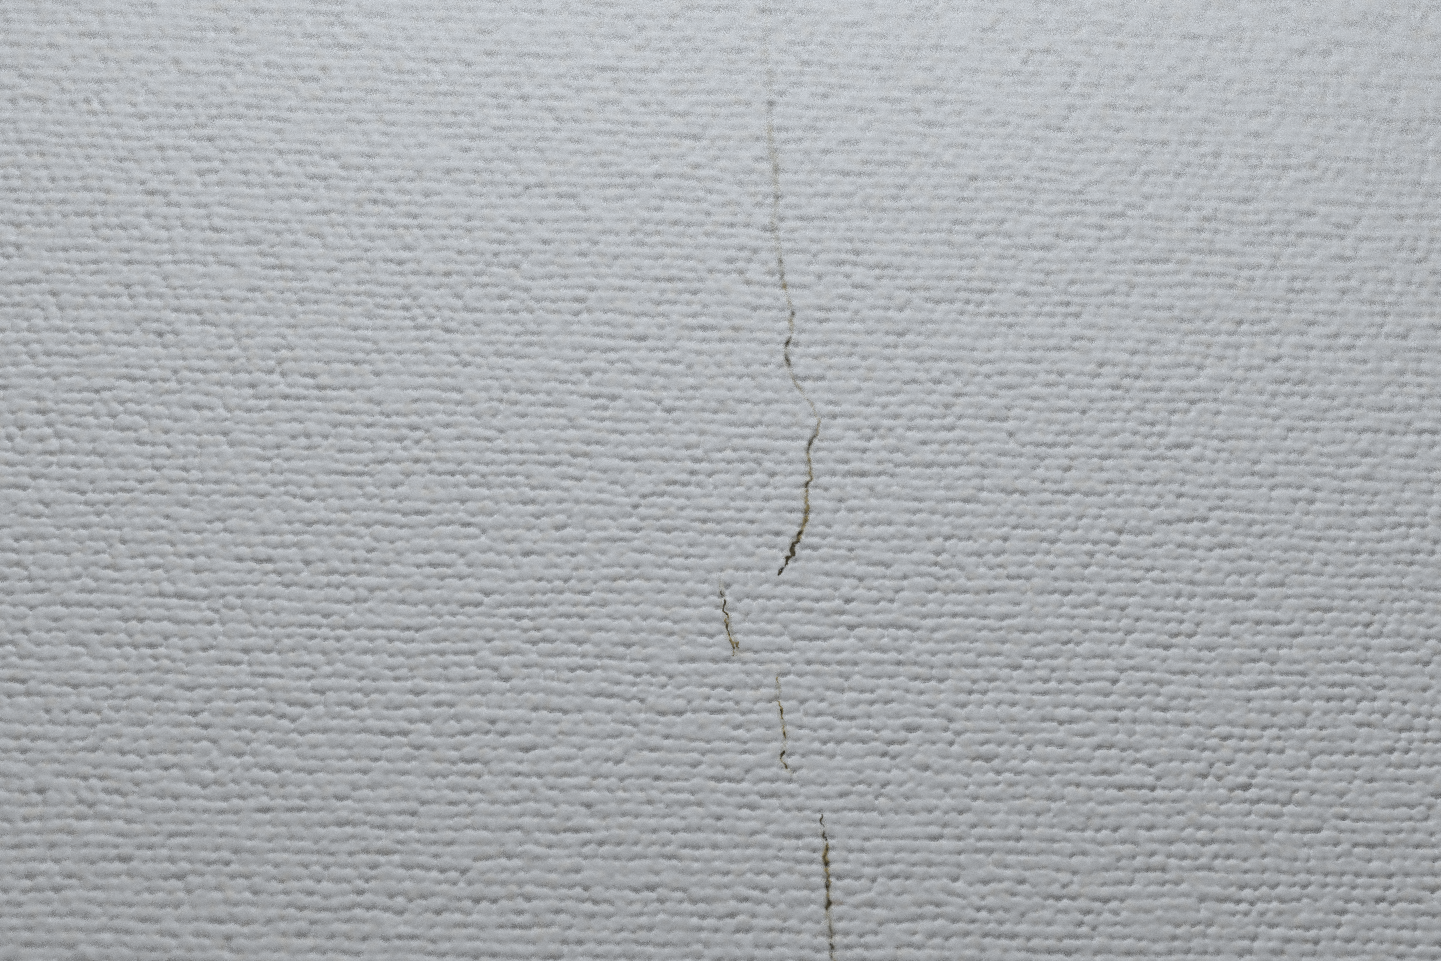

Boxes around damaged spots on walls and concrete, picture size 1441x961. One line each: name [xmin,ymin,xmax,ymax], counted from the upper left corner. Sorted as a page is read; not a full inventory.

crack [767,73,821,576]
crack [720,585,739,656]
crack [776,677,791,772]
crack [819,814,835,961]